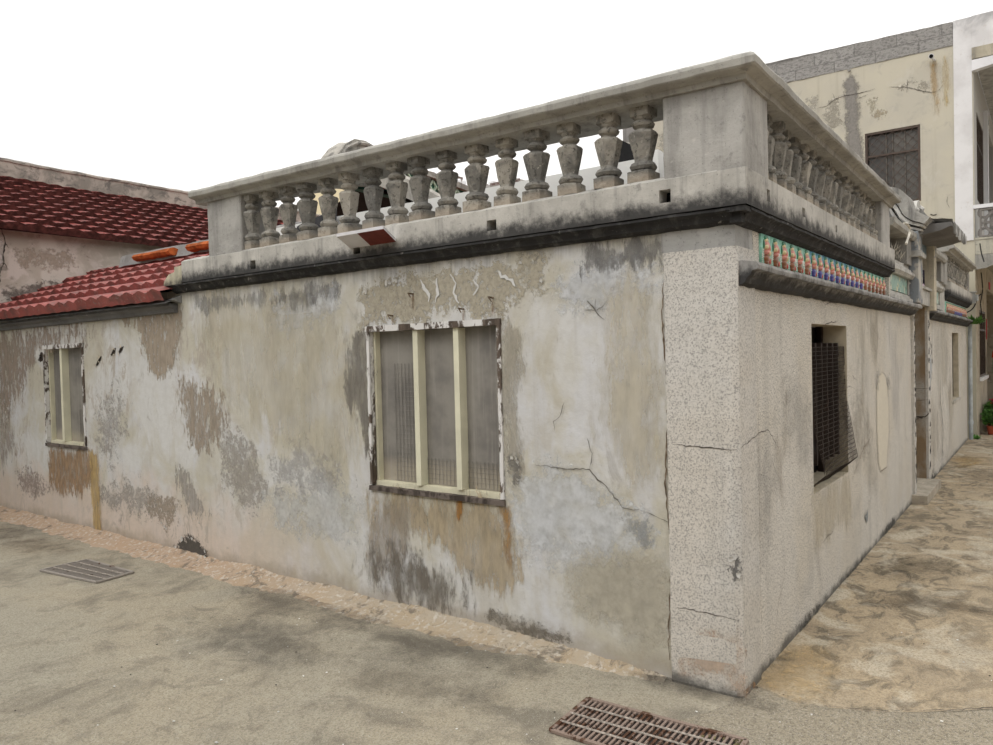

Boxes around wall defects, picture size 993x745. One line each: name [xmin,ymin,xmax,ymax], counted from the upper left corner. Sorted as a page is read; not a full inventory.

crack [659,264,667,374]
peeling [15,463,50,500]
peeling [0,317,91,462]
peeling [95,465,212,533]
spalling [174,534,207,558]
peeling [122,307,342,520]
leakage [344,324,377,455]
leakage [366,319,671,643]
crack [536,410,776,527]
crack [913,373,950,450]
crack [668,551,786,660]